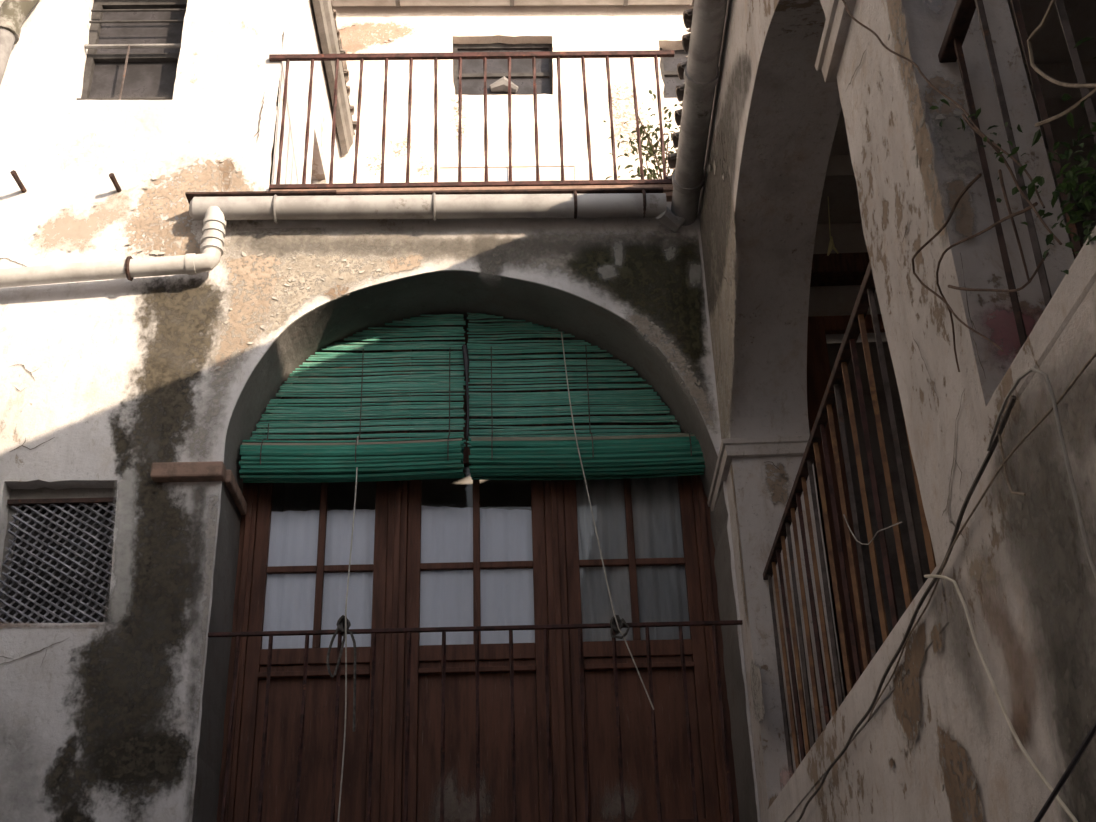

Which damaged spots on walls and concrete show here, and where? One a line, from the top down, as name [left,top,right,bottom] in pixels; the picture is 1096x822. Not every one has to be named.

peeling [338,22,412,54]
peeling [33,158,255,257]
leakage [337,56,750,359]
leakage [110,414,130,480]
leakage [190,487,205,622]
crack [0,638,68,667]
peeling [889,622,942,741]
leakage [45,736,78,793]
leakage [94,732,191,784]
peeling [937,725,983,822]
leakage [56,807,93,822]